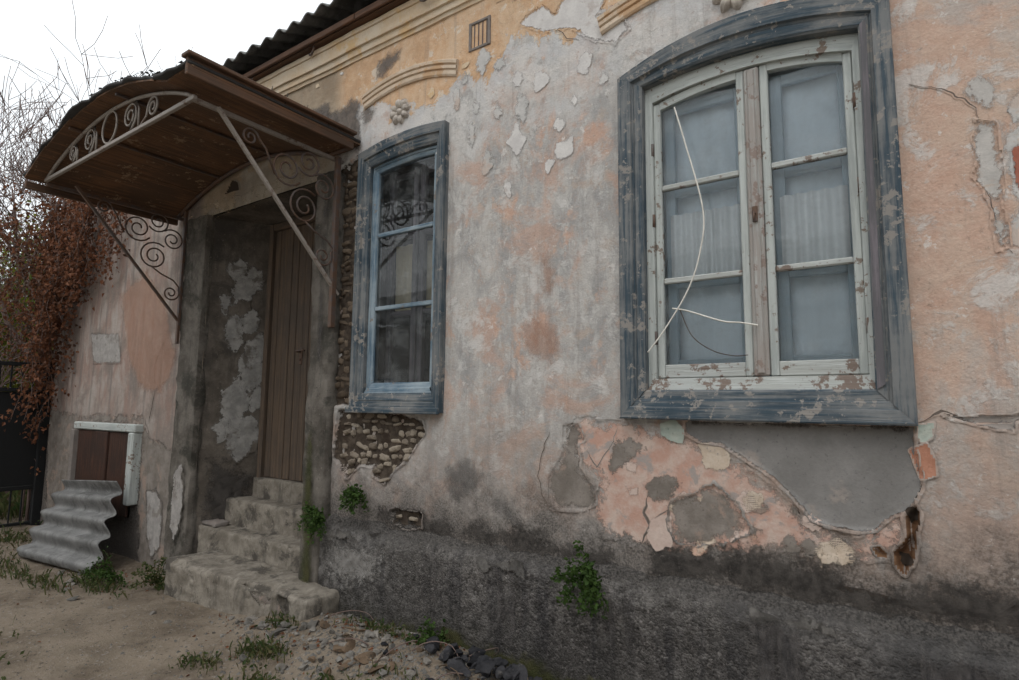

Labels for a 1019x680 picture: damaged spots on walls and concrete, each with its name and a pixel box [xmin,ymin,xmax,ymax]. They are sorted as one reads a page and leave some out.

peeling [518,0,631,74]
crack [909,84,979,121]
spalling [964,75,1019,252]
crack [976,180,1013,254]
peeling [210,258,266,464]
flaking render [332,155,426,486]
crack [919,408,1019,438]
peeling [145,462,184,560]
water stain [326,540,381,587]
water stain [374,505,618,565]
peeling [547,415,924,579]
water stain [645,541,1019,636]